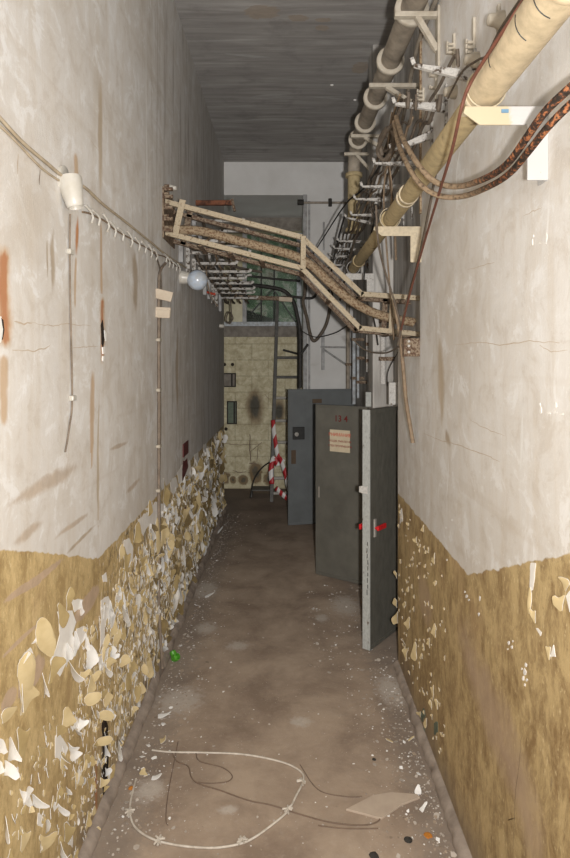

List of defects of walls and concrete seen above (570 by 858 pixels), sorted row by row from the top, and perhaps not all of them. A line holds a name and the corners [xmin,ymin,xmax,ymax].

rust [0,239,18,431]
rust [88,220,107,559]
crack [458,340,565,352]
peeling [0,430,266,858]
peeling [348,504,457,858]
peeling [527,563,542,636]
peeling [552,577,570,612]